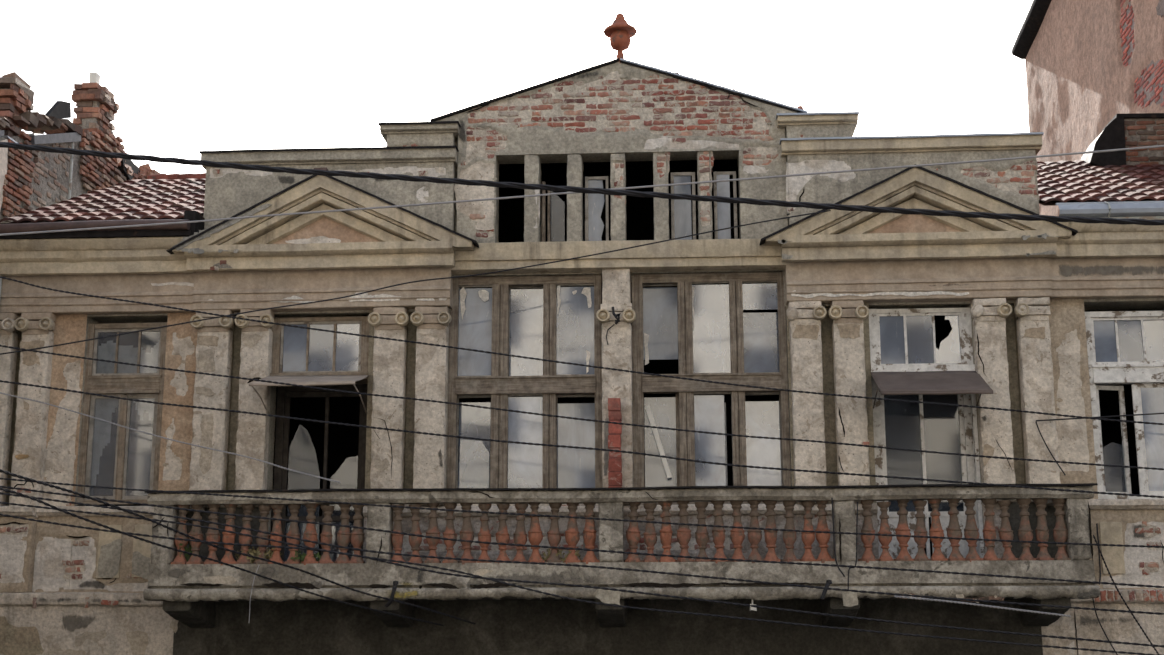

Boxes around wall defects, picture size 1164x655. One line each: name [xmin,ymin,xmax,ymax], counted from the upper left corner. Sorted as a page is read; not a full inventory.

flaking render [1120,0,1164,109]
flaking render [334,71,856,238]
peeling [170,332,219,396]
peeling [0,524,148,609]
peeling [1081,521,1164,602]